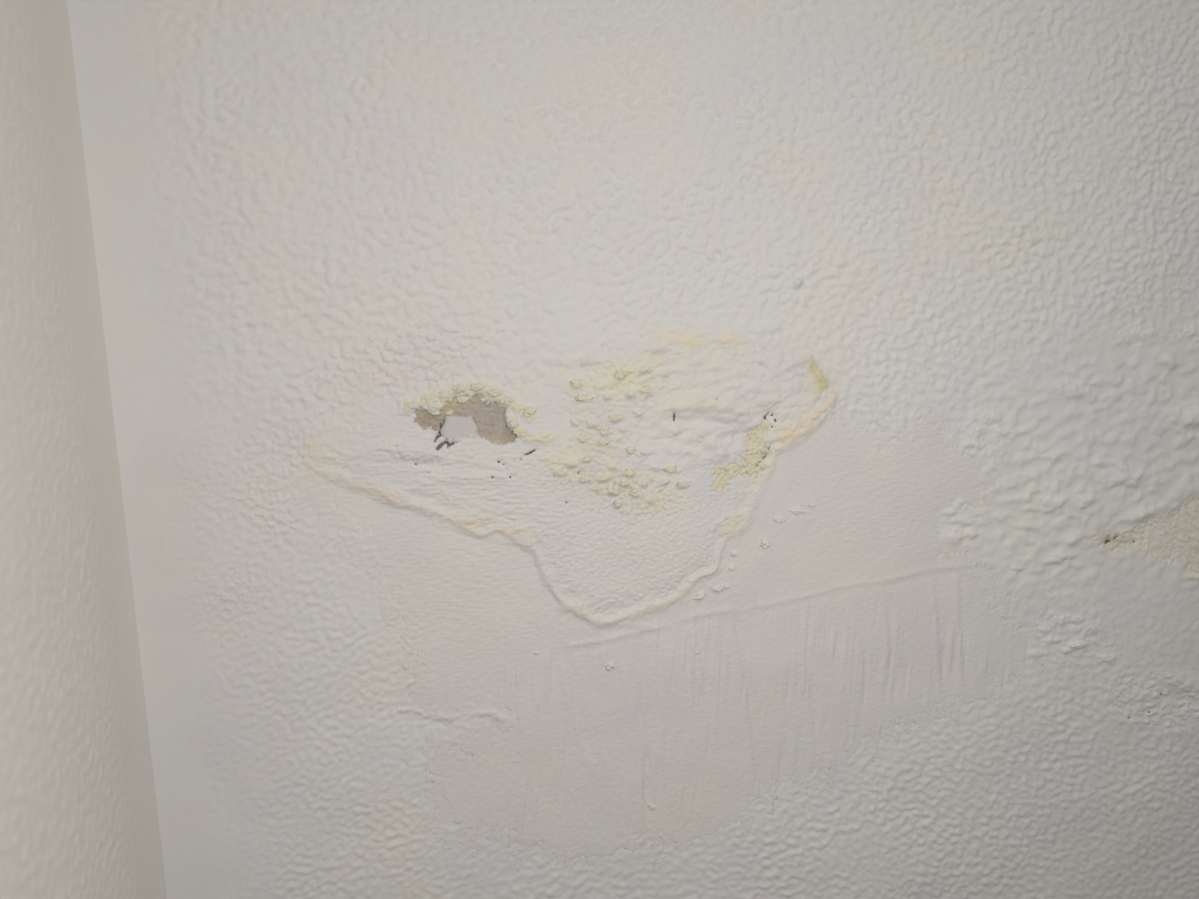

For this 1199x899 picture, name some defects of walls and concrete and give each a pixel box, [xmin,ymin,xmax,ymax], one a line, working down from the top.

spalling [399,382,556,450]